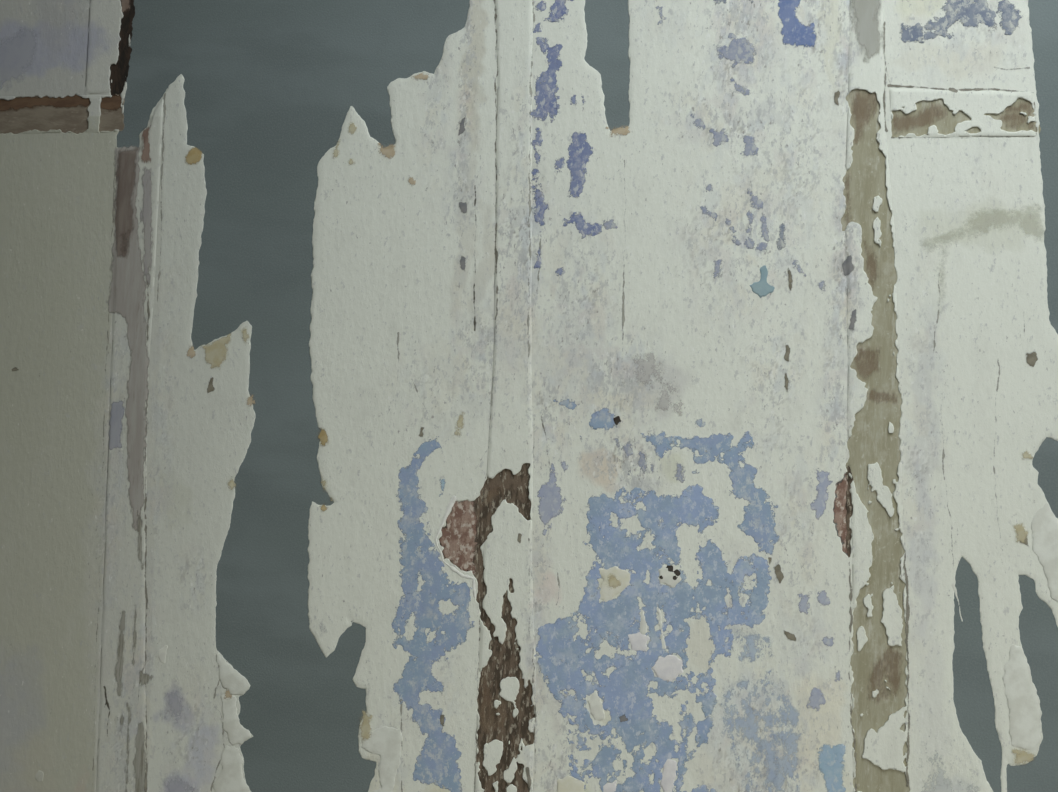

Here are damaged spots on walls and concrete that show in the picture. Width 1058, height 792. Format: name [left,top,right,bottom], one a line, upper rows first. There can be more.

peeling [0,0,256,792]
peeling [307,0,1058,792]